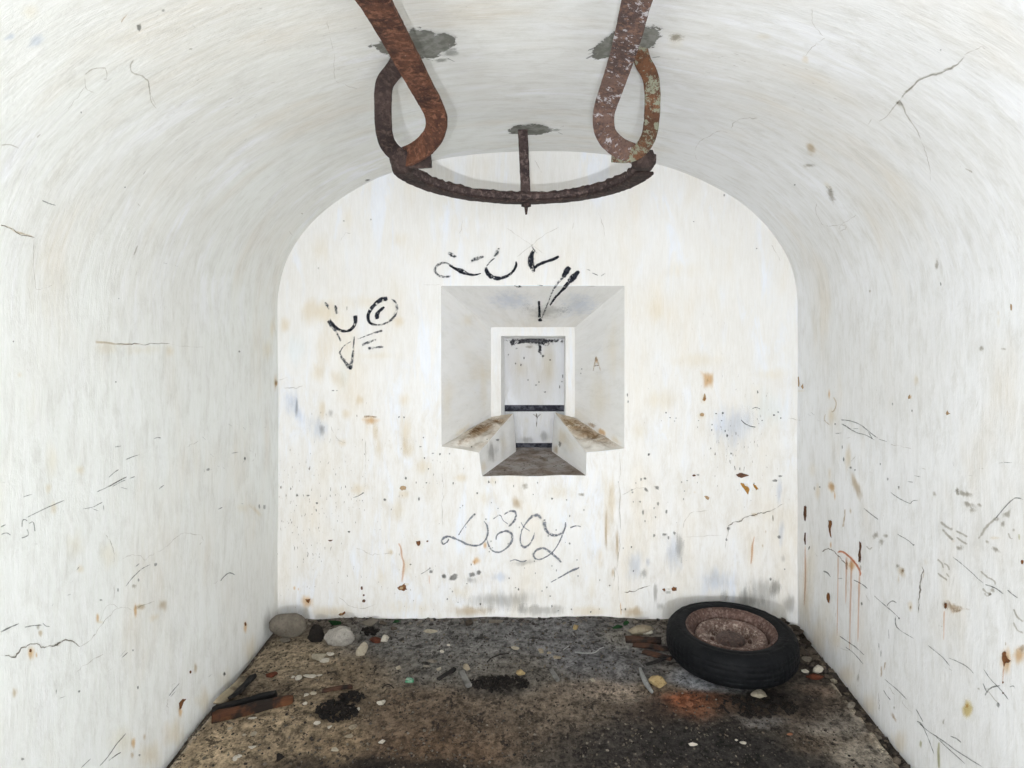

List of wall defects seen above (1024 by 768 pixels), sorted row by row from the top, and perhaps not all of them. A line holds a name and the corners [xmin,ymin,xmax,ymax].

crack [6,639,75,658]